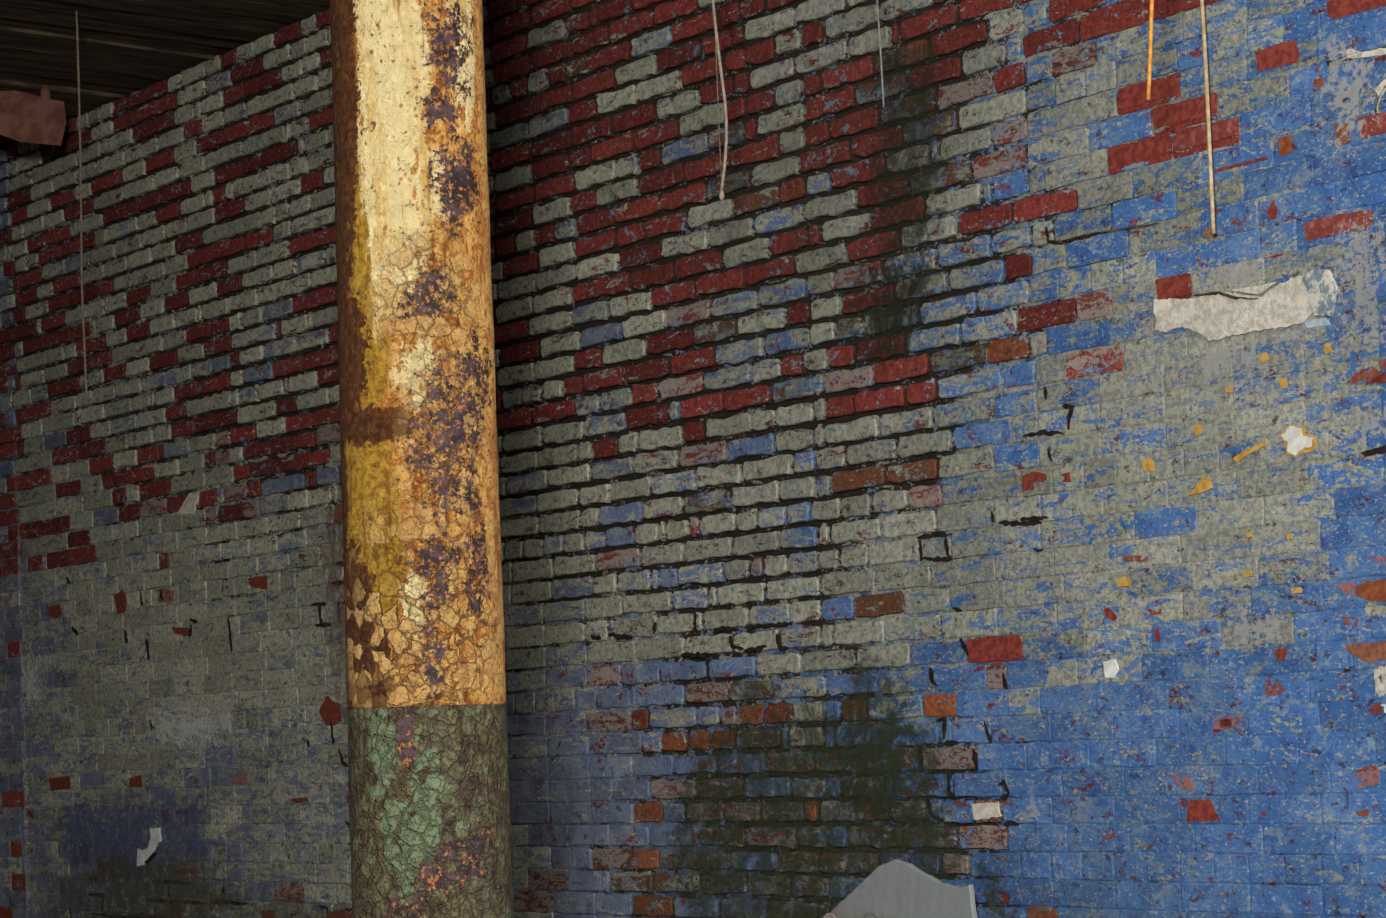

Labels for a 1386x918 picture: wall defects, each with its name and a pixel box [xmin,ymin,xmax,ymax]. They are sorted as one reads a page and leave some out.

rust [410,0,486,250]
peeling [1155,273,1192,300]
peeling [1231,281,1281,295]
peeling [1305,318,1331,328]
rust [392,255,496,778]
water stain [667,657,958,918]
rust [382,815,496,918]